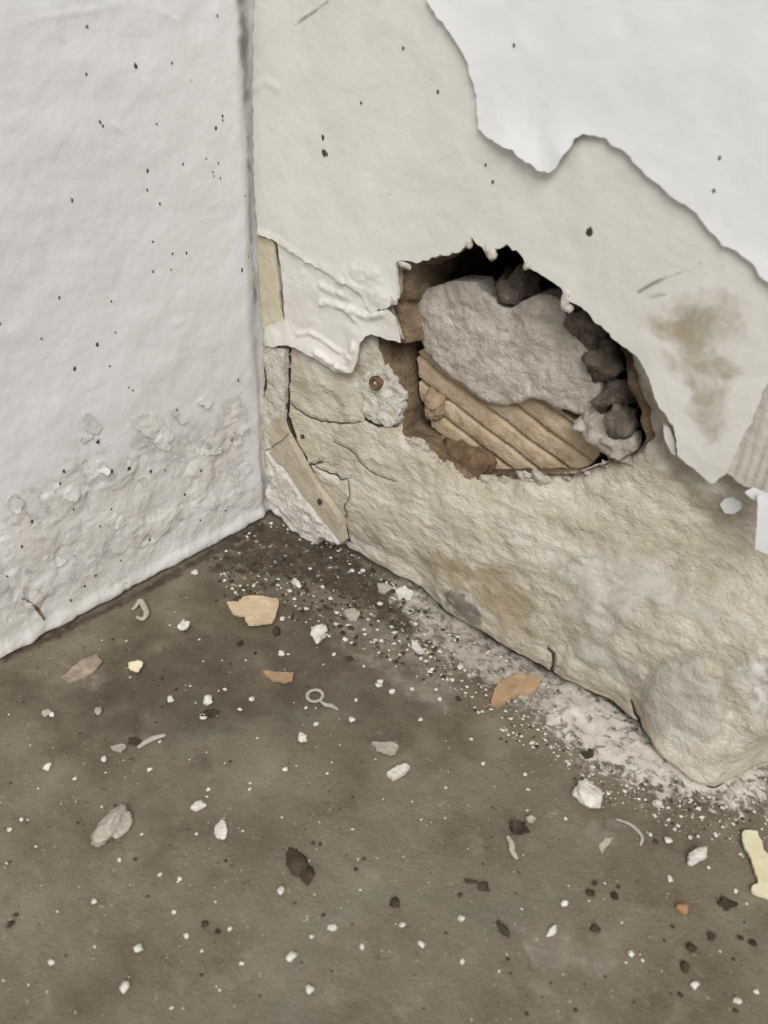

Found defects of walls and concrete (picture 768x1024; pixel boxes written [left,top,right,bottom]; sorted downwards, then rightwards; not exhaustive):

peeling [252,0,768,554]
peeling [0,397,267,658]
crack [262,345,400,542]
damp [444,591,481,625]
damp [589,554,718,629]
damp [738,657,768,747]